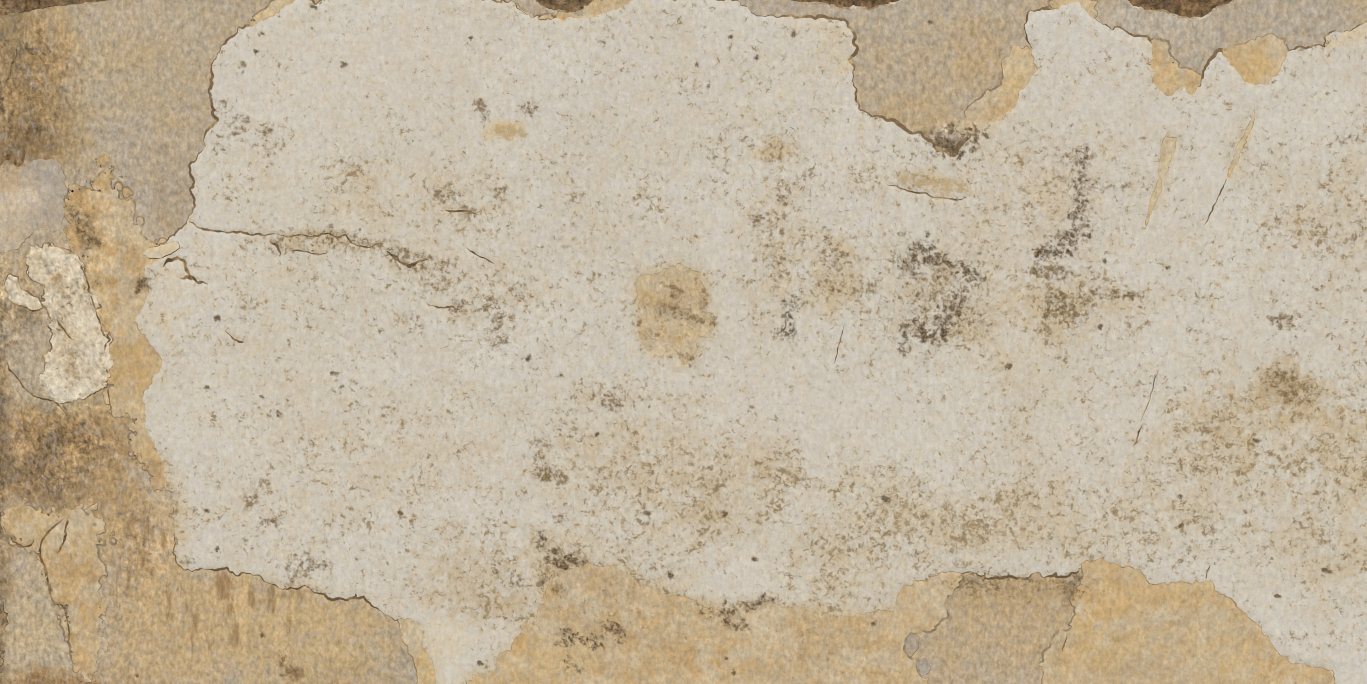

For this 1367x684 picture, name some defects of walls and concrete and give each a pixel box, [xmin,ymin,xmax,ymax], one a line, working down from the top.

flaking render [482,0,633,21]
spalling [716,0,1367,157]
crack [163,256,207,284]
spalling [0,0,436,684]
crack [189,221,427,268]
crack [445,208,476,216]
flaking render [634,262,715,366]
flaking render [1145,135,1177,226]
flaking render [1227,109,1255,178]
flaking render [466,558,1335,684]